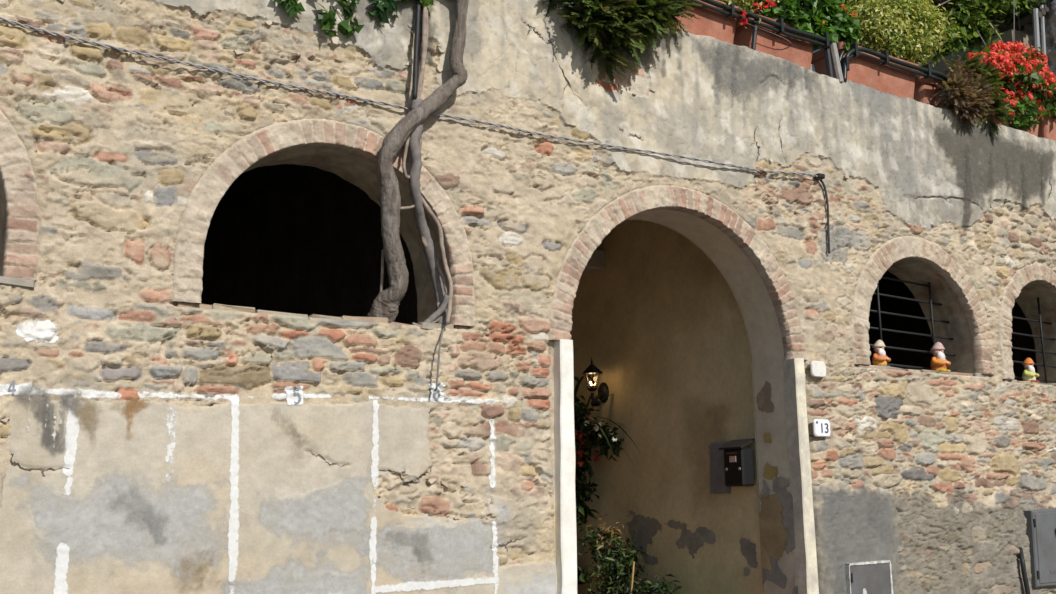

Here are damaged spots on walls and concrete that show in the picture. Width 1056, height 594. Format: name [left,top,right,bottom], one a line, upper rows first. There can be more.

spalling [0,0,346,63]
spalling [405,24,446,82]
crack [522,19,588,107]
spalling [597,61,656,97]
crack [904,196,982,209]
damp [19,390,95,453]
peeling [756,381,774,413]
peeling [627,511,716,565]
peeling [740,463,798,594]